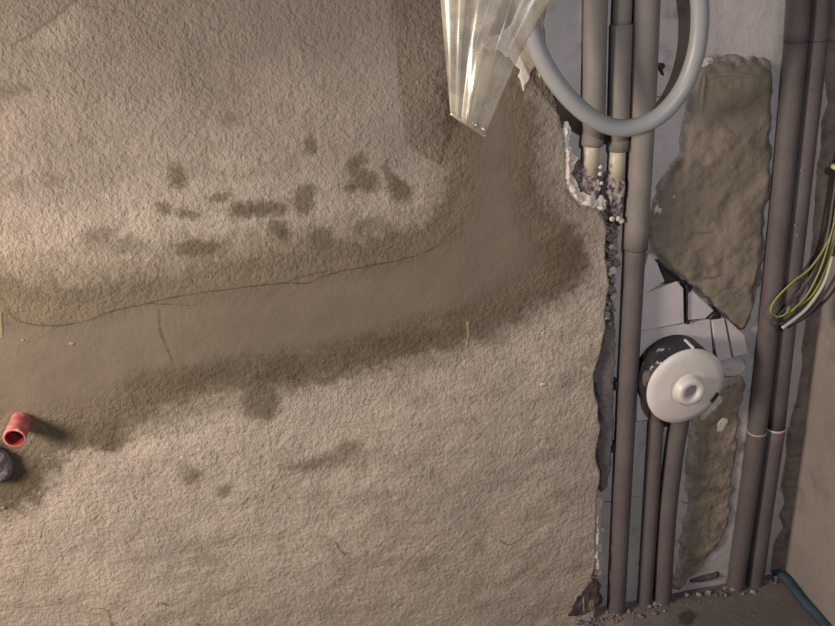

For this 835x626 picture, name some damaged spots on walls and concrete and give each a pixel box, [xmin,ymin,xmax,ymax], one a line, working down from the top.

crack [3,227,455,359]
leakage [0,37,585,509]
spalling [562,121,624,616]
peeling [717,418,728,432]
peeling [770,0,835,573]